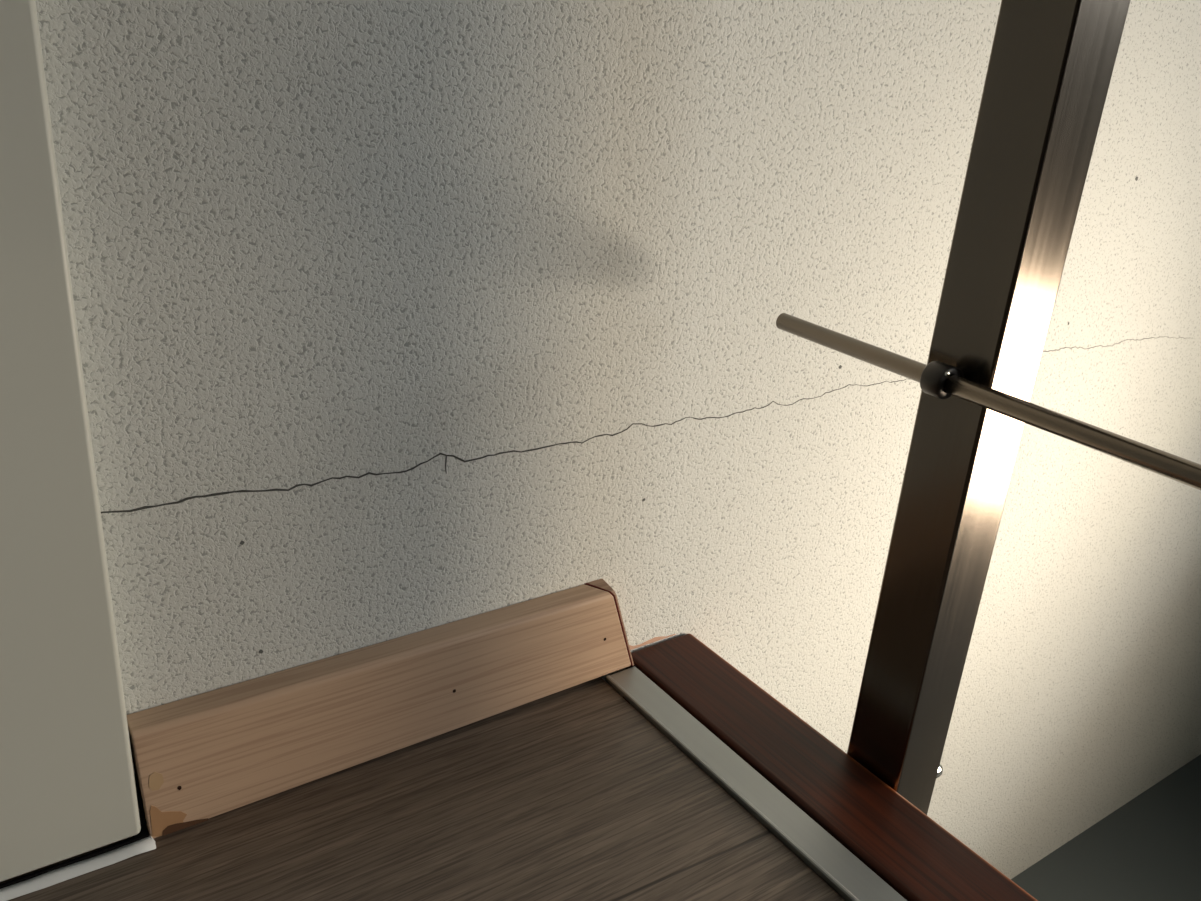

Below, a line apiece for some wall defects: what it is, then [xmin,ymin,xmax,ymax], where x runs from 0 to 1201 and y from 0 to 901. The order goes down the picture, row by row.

crack [1043,336,1186,352]
crack [101,379,906,514]